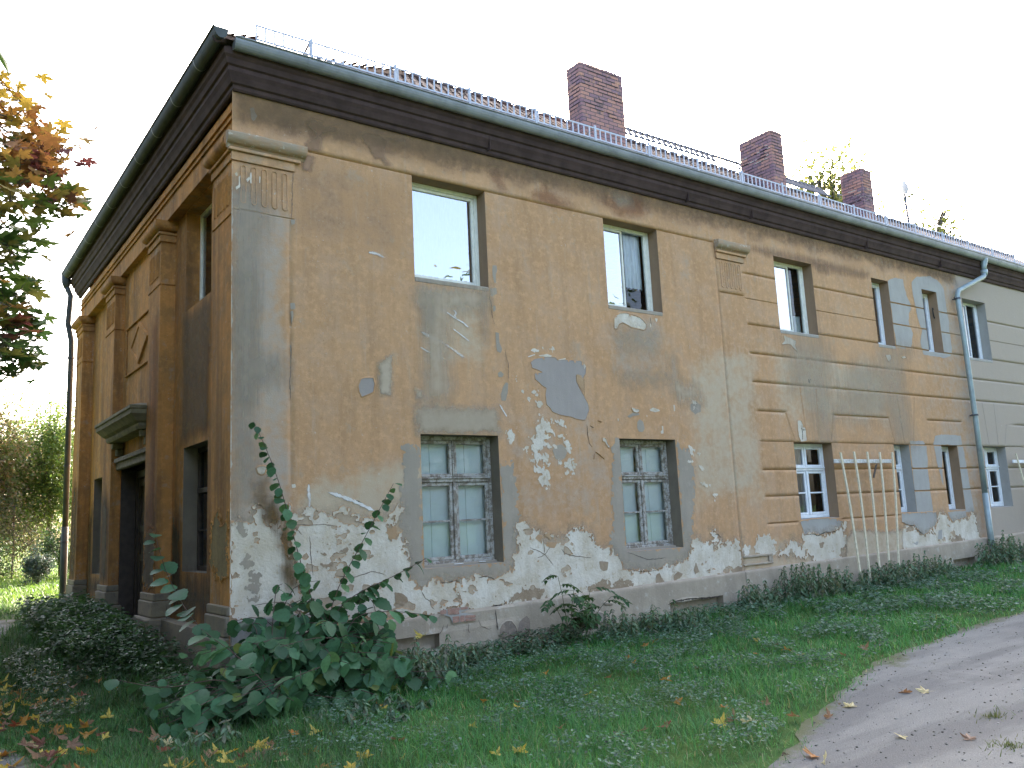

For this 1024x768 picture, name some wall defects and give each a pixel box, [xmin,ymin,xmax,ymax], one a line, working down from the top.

spalling [231,172,261,327]
peeling [613,312,657,331]
peeling [505,376,577,490]
peeling [209,416,980,624]